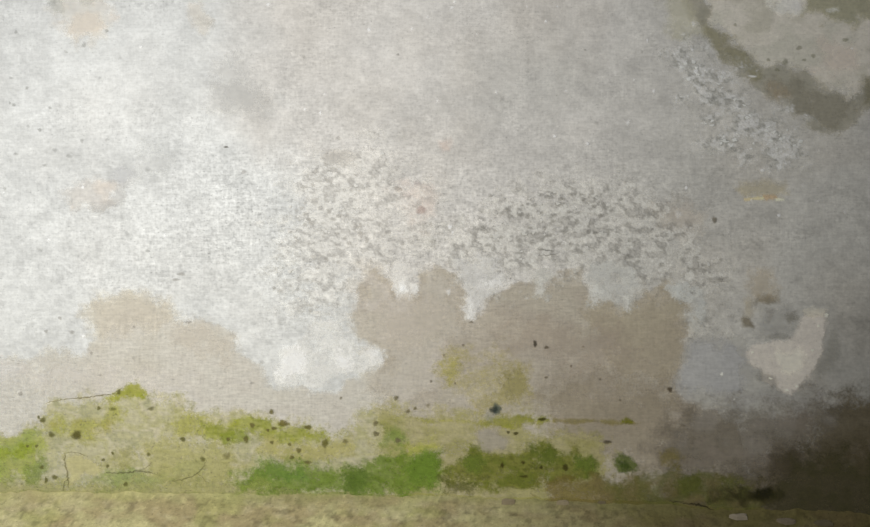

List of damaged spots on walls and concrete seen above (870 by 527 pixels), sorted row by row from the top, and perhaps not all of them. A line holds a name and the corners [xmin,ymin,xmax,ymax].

damp [682,0,870,134]
crack [47,388,122,403]
damp [0,252,870,515]
crack [63,452,154,488]